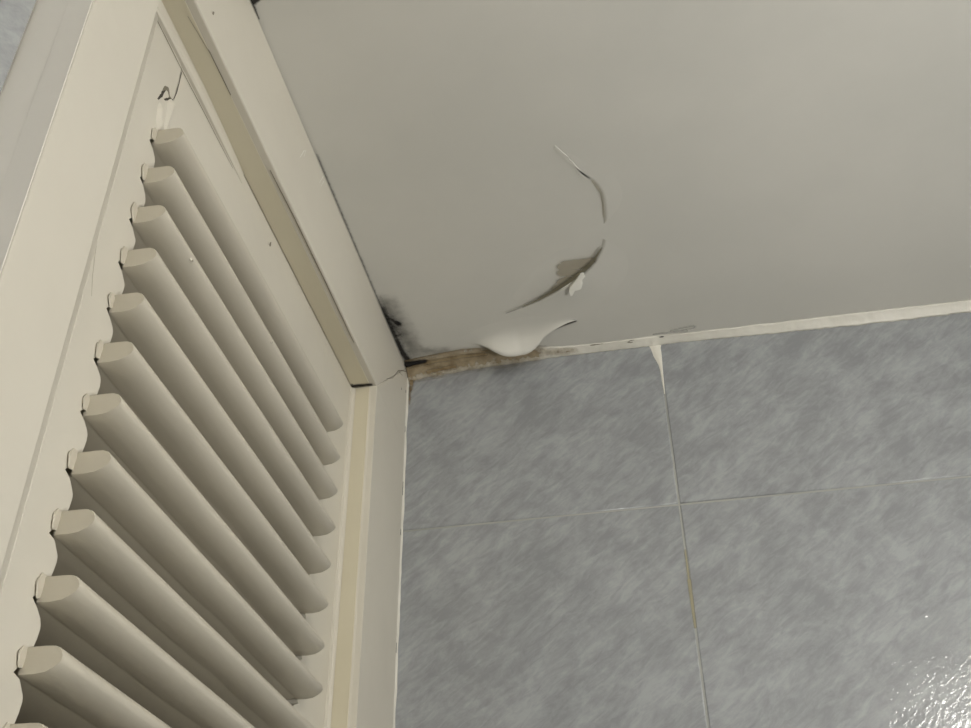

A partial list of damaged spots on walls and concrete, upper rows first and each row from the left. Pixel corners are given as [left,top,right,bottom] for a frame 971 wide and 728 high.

peeling [554,146,622,223]
damp [318,159,419,367]
peeling [513,239,628,315]